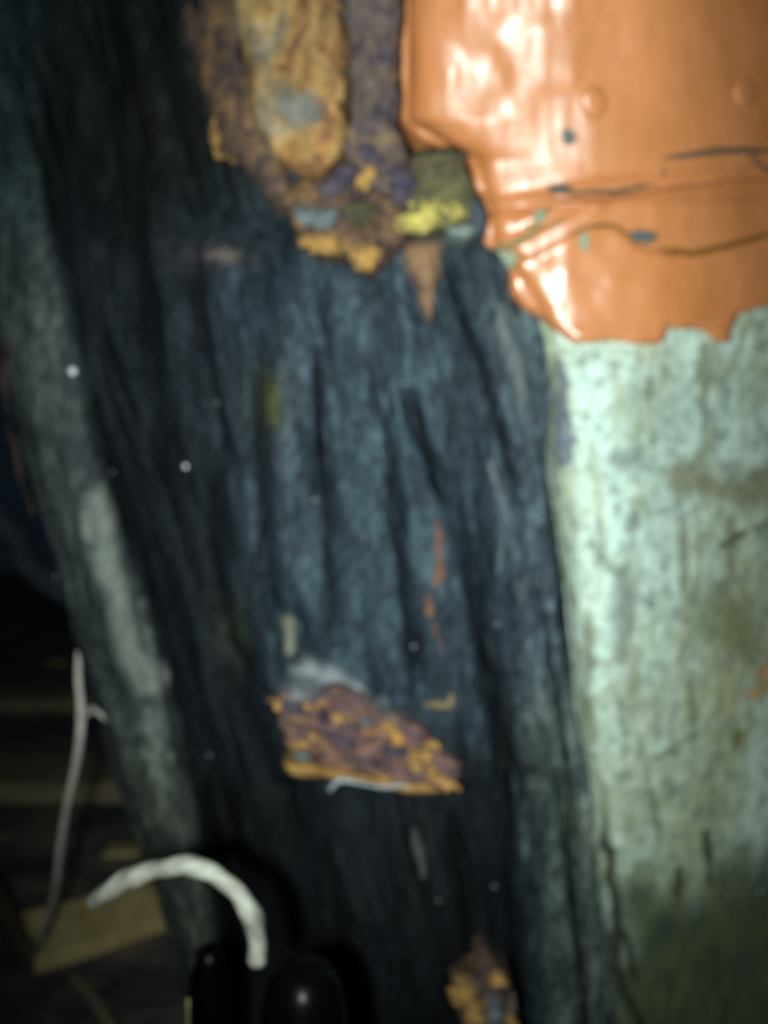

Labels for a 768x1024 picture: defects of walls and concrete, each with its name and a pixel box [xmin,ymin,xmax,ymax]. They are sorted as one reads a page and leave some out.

peeling [399,0,768,257]
rust [393,147,489,318]
rust [427,694,453,708]